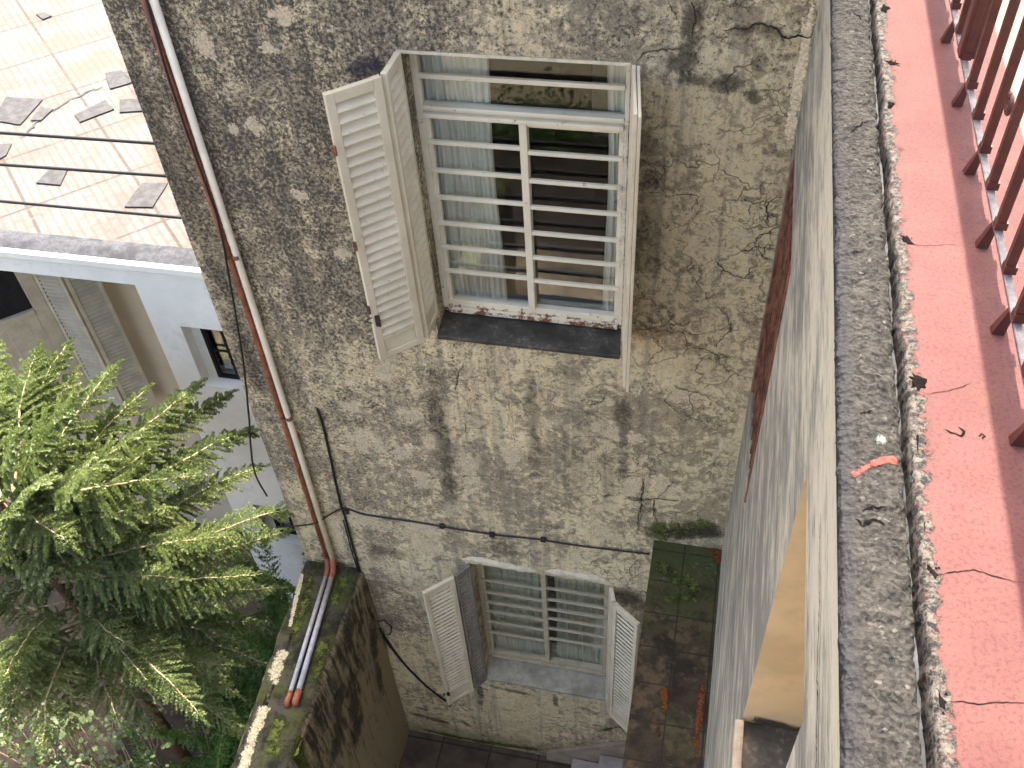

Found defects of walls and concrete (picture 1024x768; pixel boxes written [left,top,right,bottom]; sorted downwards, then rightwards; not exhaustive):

crack [639,1,701,59]
crack [725,22,813,42]
crack [680,197,782,360]
crack [626,475,675,531]
crack [939,569,1021,583]
damp [332,583,363,764]
damp [370,621,384,700]
crack [945,699,1024,707]